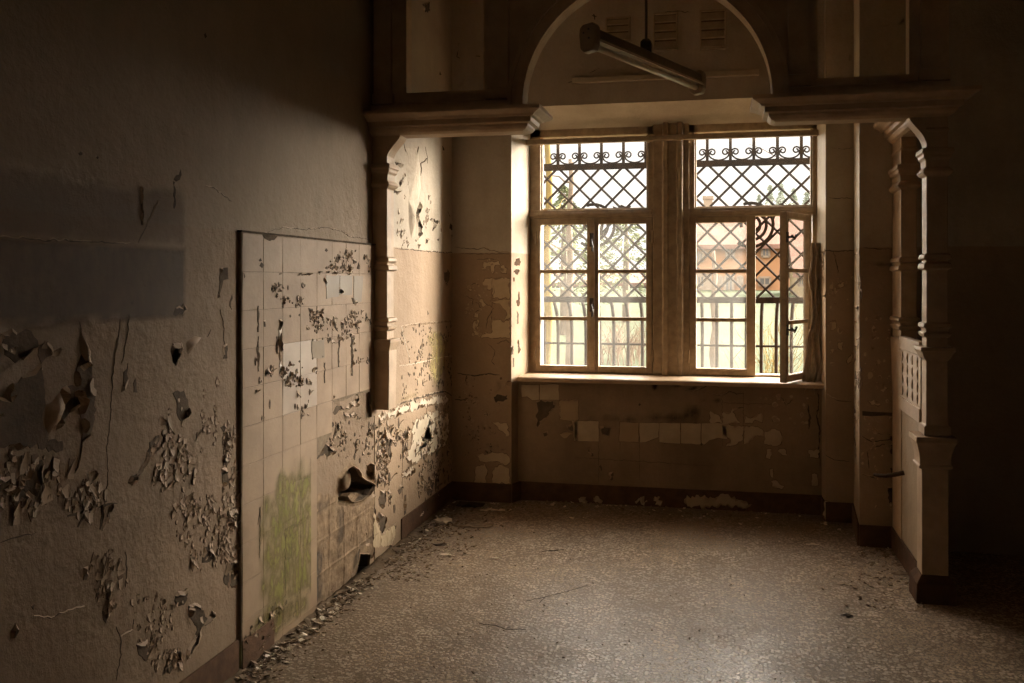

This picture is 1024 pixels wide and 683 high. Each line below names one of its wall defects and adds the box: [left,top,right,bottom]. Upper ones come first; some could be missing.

peeling [394,160,453,250]
peeling [254,248,374,419]
peeling [466,257,521,367]
peeling [0,328,114,531]
crack [67,316,130,529]
peeling [83,548,130,623]
peeling [130,588,216,674]
peeling [128,377,242,588]
leakage [254,473,322,635]
spalling [317,313,454,603]
peeling [639,407,783,447]
spalling [684,494,751,509]